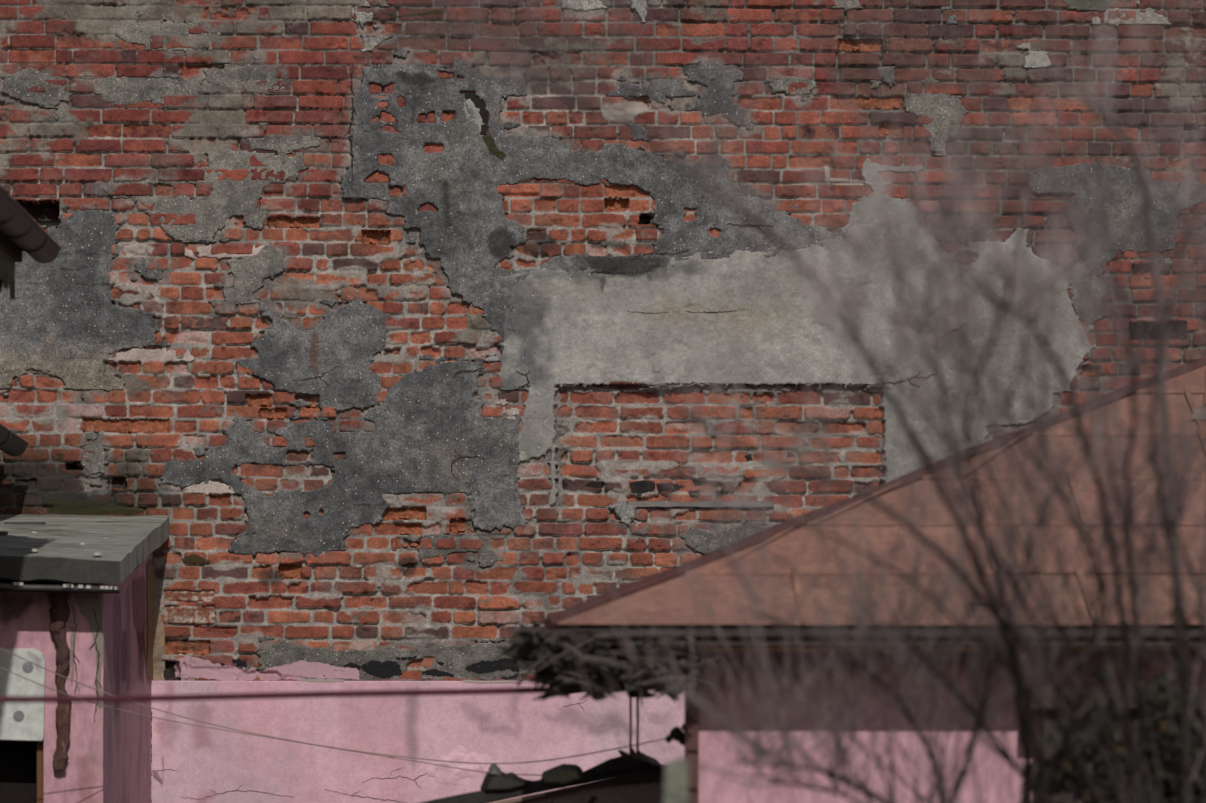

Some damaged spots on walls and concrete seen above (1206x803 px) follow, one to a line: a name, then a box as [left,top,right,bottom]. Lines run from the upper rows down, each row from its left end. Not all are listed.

peeling [1062,0,1172,28]
peeling [0,0,1100,580]
peeling [71,594,104,708]
peeling [143,557,525,681]
crack [151,694,291,803]
crack [325,767,436,803]